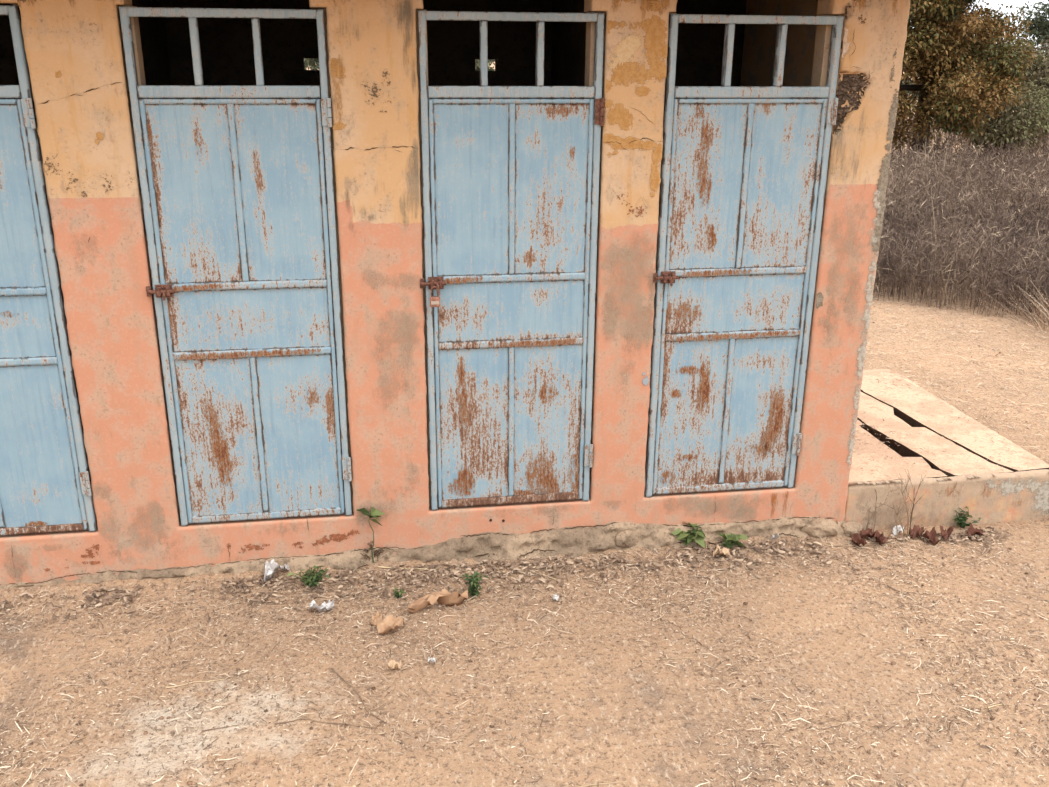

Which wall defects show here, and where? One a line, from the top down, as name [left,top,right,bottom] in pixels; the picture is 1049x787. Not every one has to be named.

spalling [842,5,852,58]
peeling [603,0,668,217]
spalling [833,72,870,134]
rust [694,105,713,209]
rust [666,301,800,341]
rust [202,398,233,488]
rust [175,348,321,373]
rust [456,356,470,443]
rust [663,354,711,412]
rust [748,386,784,456]
rust [448,465,476,497]
rust [508,453,580,496]